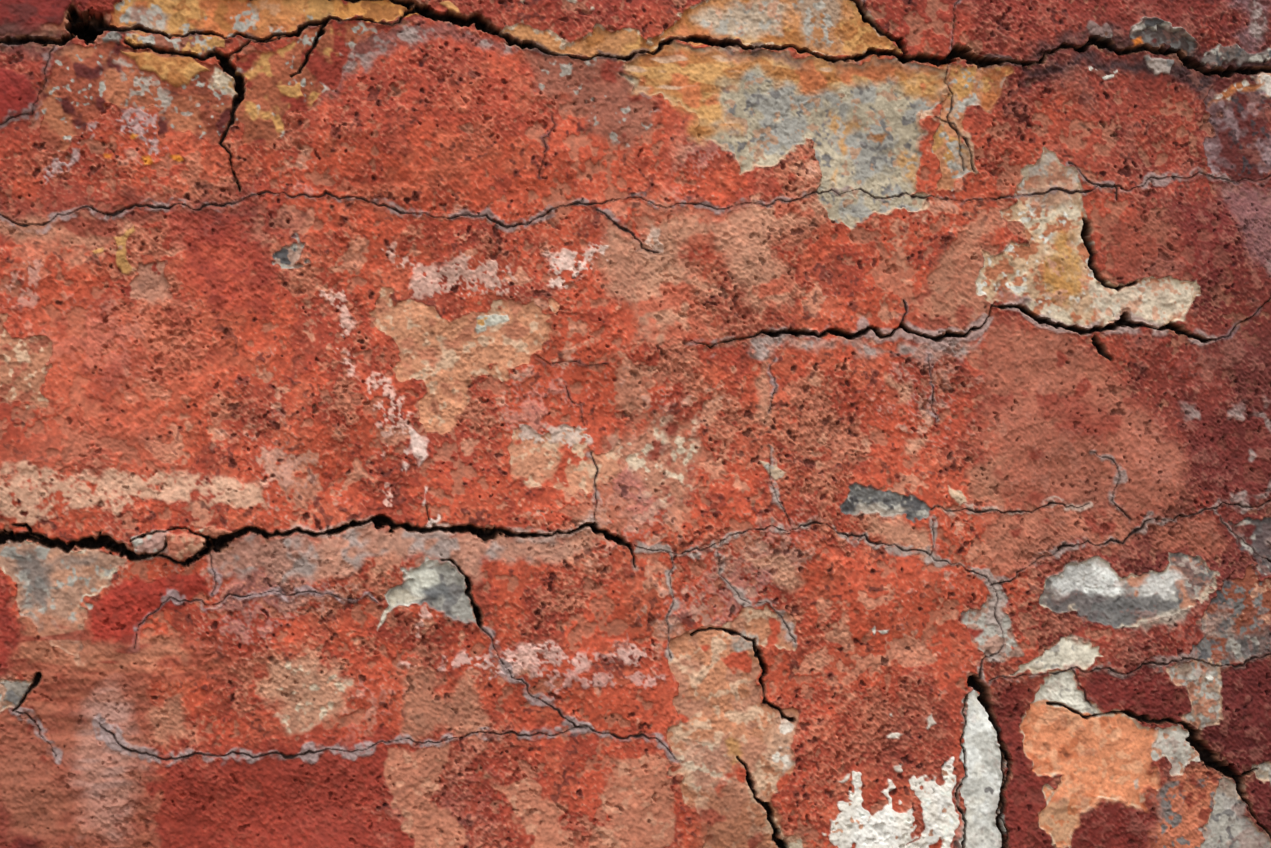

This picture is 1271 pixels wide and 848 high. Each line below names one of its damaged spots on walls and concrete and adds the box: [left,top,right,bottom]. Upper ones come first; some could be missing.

spalling [0,0,407,152]
peeling [440,1,460,14]
peeling [502,0,1014,230]
crack [0,0,1271,423]
peeling [975,147,1202,327]
spalling [840,482,930,523]
spalling [377,560,476,628]
crack [0,354,1271,848]
peeling [958,517,1271,848]